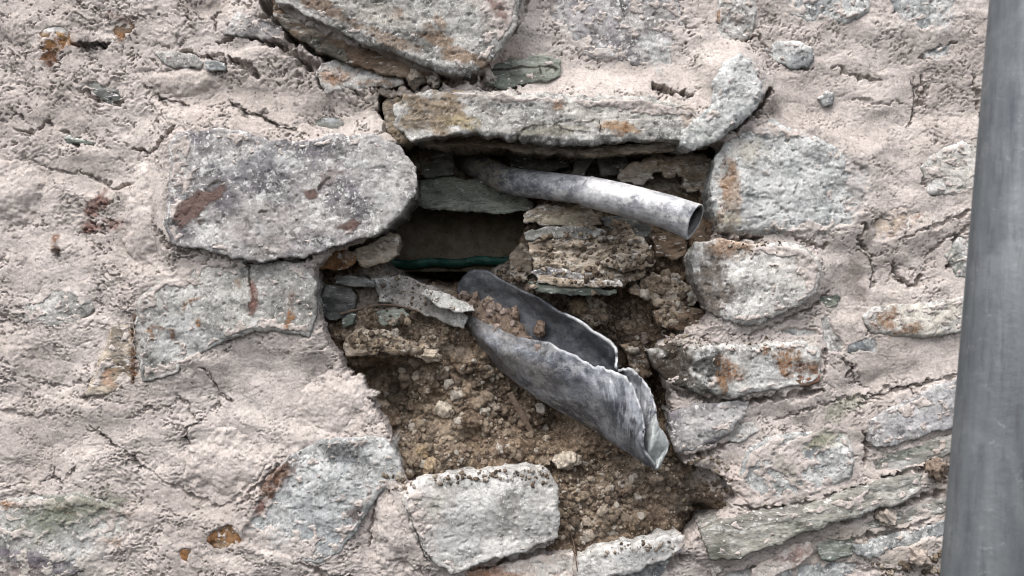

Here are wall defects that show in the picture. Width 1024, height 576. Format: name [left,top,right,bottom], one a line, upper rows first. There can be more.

spalling [304,189,319,199]
spalling [337,218,361,231]
corrosion [764,348,819,377]
crack [90,425,141,464]